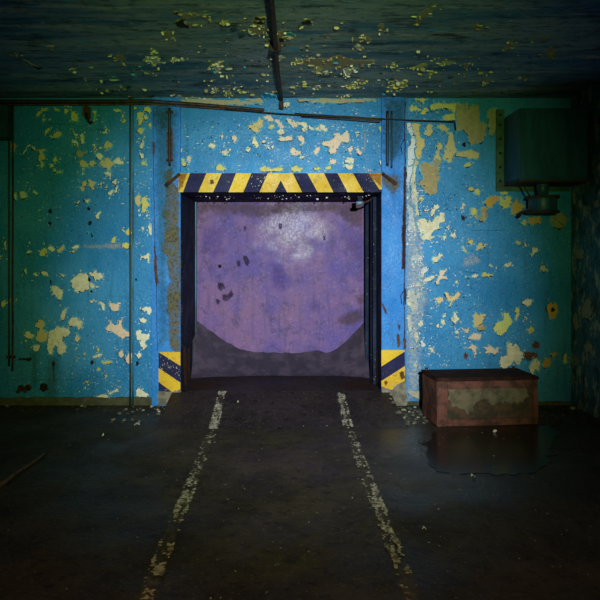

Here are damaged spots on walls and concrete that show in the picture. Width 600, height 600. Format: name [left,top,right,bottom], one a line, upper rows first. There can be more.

peeling [84,48,188,97]
spalling [161,10,211,41]
peeling [219,15,313,52]
peeling [170,21,480,188]
peeling [23,242,80,257]
peeling [10,105,129,219]
peeling [21,268,152,378]
peeling [109,106,152,264]
corrosion [162,169,190,385]
corrosion [369,167,406,269]
peeling [382,91,570,406]